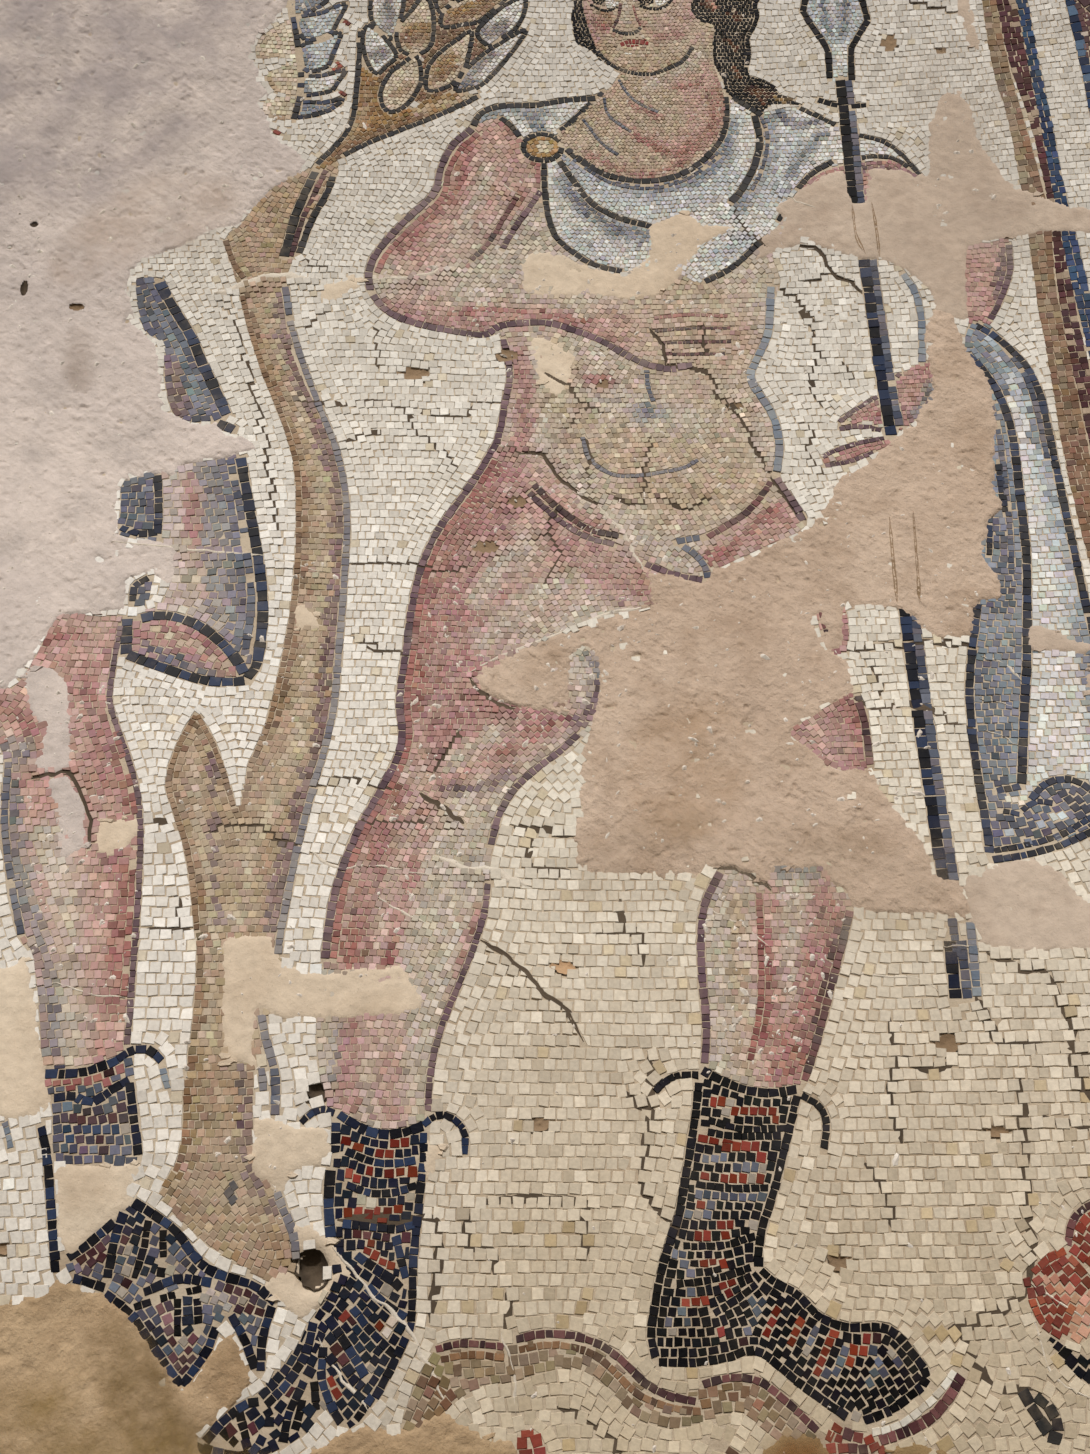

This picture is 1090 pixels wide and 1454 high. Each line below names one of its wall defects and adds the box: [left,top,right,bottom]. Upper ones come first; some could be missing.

spalling [0,0,306,858]
crack [111,259,495,573]
crack [500,372,712,584]
crack [649,321,807,520]
spalling [471,90,1090,954]
crack [729,205,862,475]
crack [209,730,572,924]
spalling [217,935,424,1067]
spalling [0,1280,251,1454]
spalling [261,1223,352,1319]
spalling [299,1411,517,1454]
crack [332,1193,591,1413]